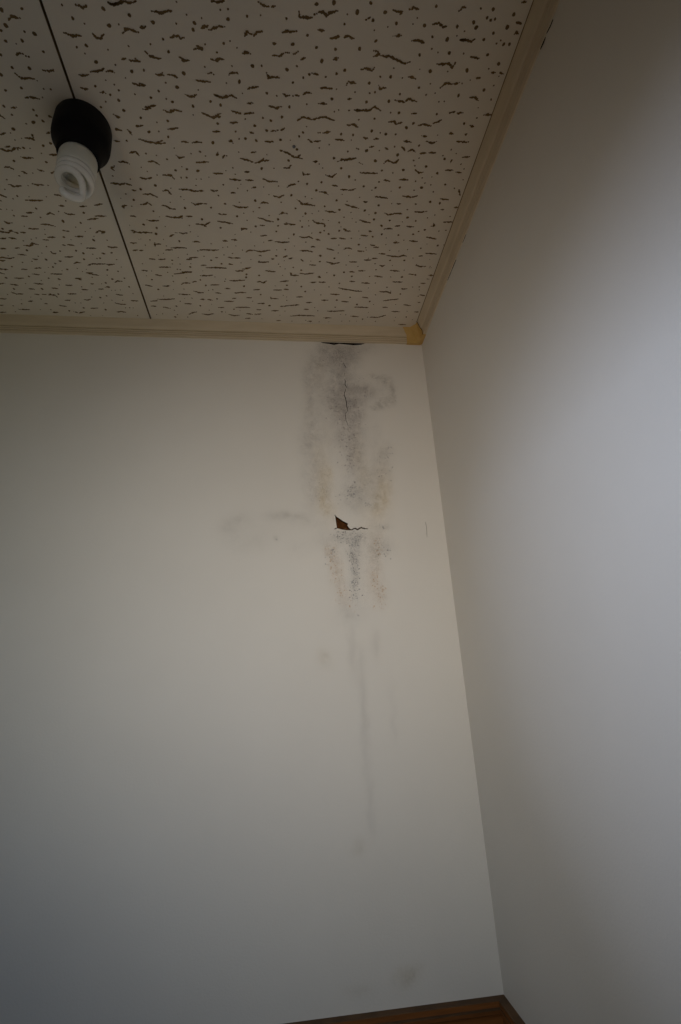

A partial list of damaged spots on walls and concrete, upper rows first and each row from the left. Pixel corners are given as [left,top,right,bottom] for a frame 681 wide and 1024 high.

spalling [335,516,367,531]